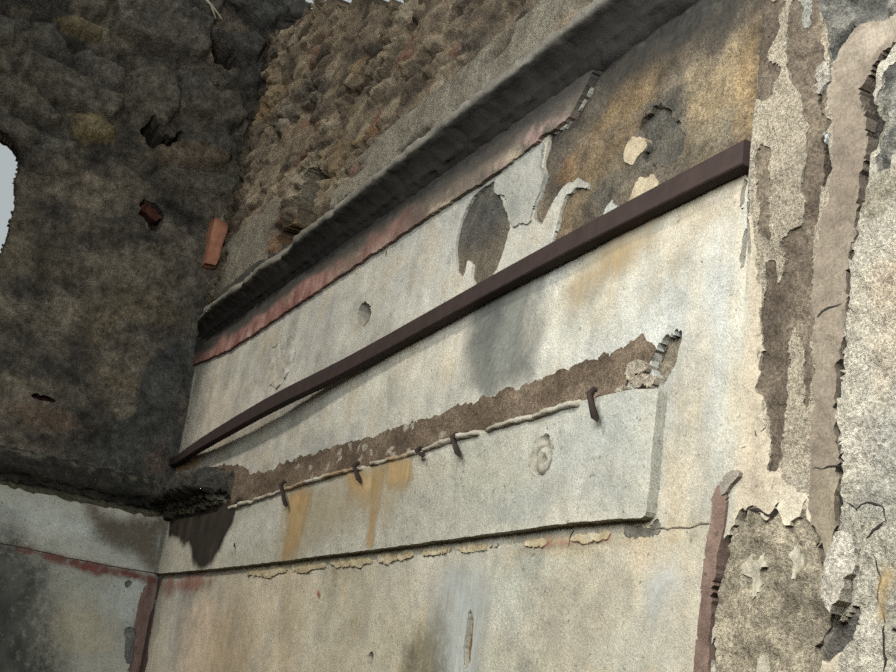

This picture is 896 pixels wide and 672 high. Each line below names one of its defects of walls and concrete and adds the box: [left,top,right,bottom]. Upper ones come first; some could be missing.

spalling [458,0,896,472]
crack [839,342,847,398]
water stain [0,539,54,672]
corrosion [282,490,311,560]
peeling [247,542,500,578]
corrosion [348,459,411,545]
peeling [524,538,549,549]
peeling [570,529,612,544]
spalling [714,502,835,672]
crack [839,495,887,671]